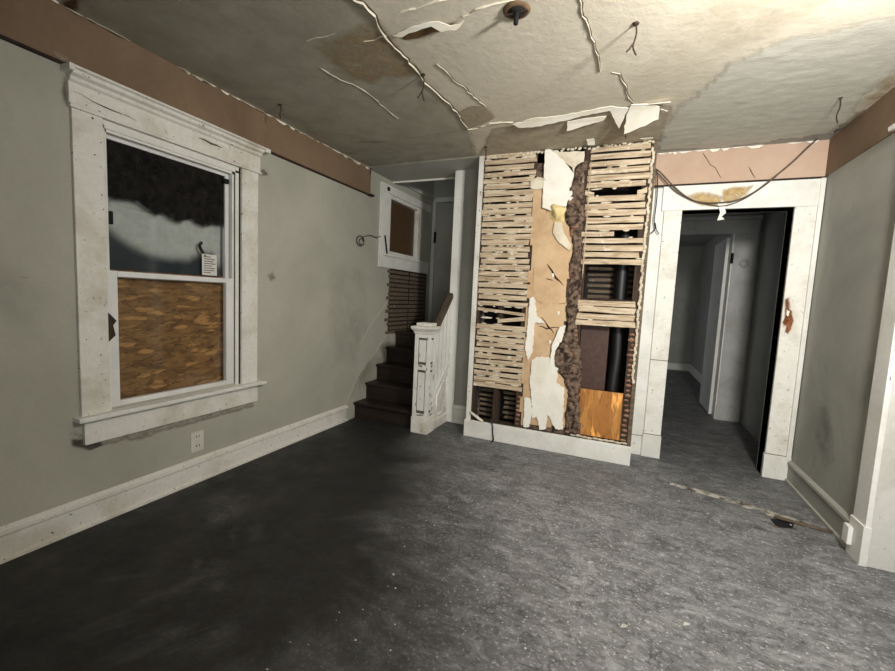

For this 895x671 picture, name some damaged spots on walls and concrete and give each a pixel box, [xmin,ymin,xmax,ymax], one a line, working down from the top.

crack [74,91,136,121]
crack [321,68,397,118]
leakage [330,29,414,82]
crack [353,0,514,139]
crack [579,0,634,103]
spalling [482,101,763,435]
rust [783,299,793,333]